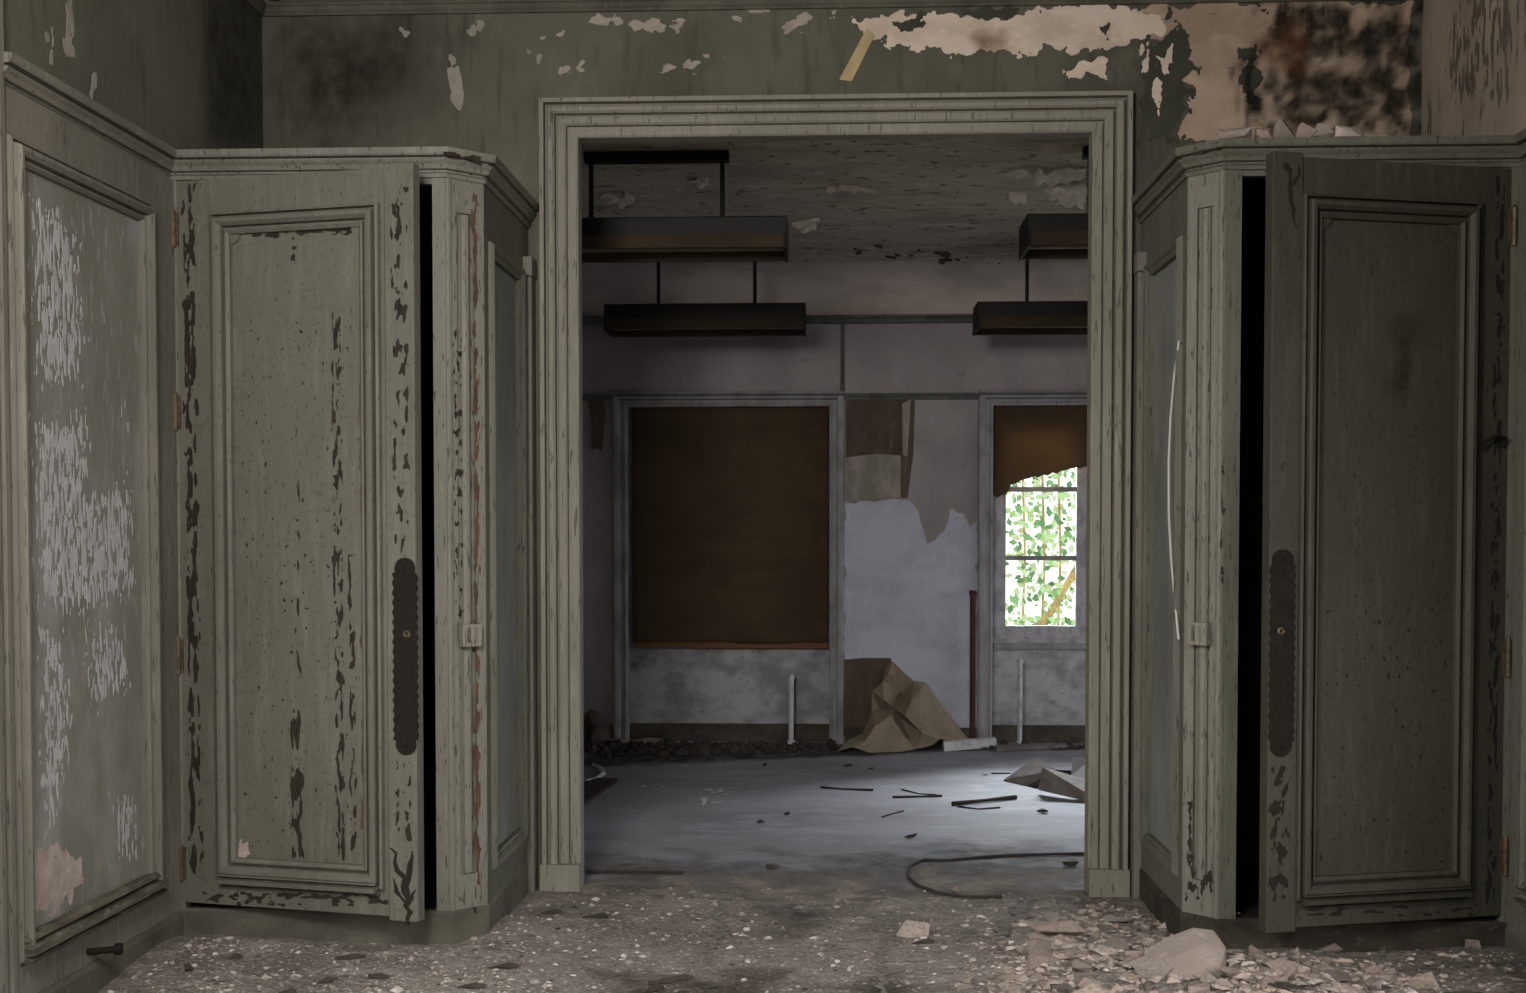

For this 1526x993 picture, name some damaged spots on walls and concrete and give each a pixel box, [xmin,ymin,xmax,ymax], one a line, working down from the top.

peeling [45,0,75,65]
flaking render [447,54,464,111]
flaking render [589,13,686,34]
flaking render [782,0,1414,155]
leakage [1241,0,1423,134]
peeling [28,192,89,391]
peeling [252,228,352,261]
peeling [390,186,410,554]
peeling [29,407,137,917]
peeling [181,182,215,875]
peeling [235,311,364,861]
peeling [202,890,388,907]